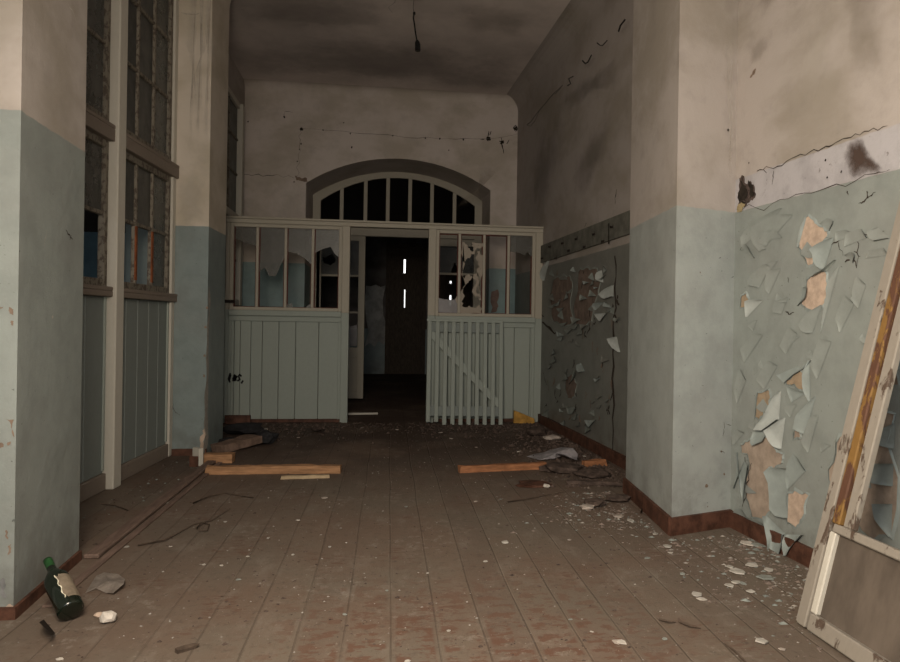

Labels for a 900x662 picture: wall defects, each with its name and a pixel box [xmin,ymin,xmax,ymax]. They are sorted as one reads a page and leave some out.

spalling [737,175,756,212]
peeling [539,261,620,422]
peeling [740,291,763,317]
peeling [796,214,836,312]
peeling [733,360,816,556]